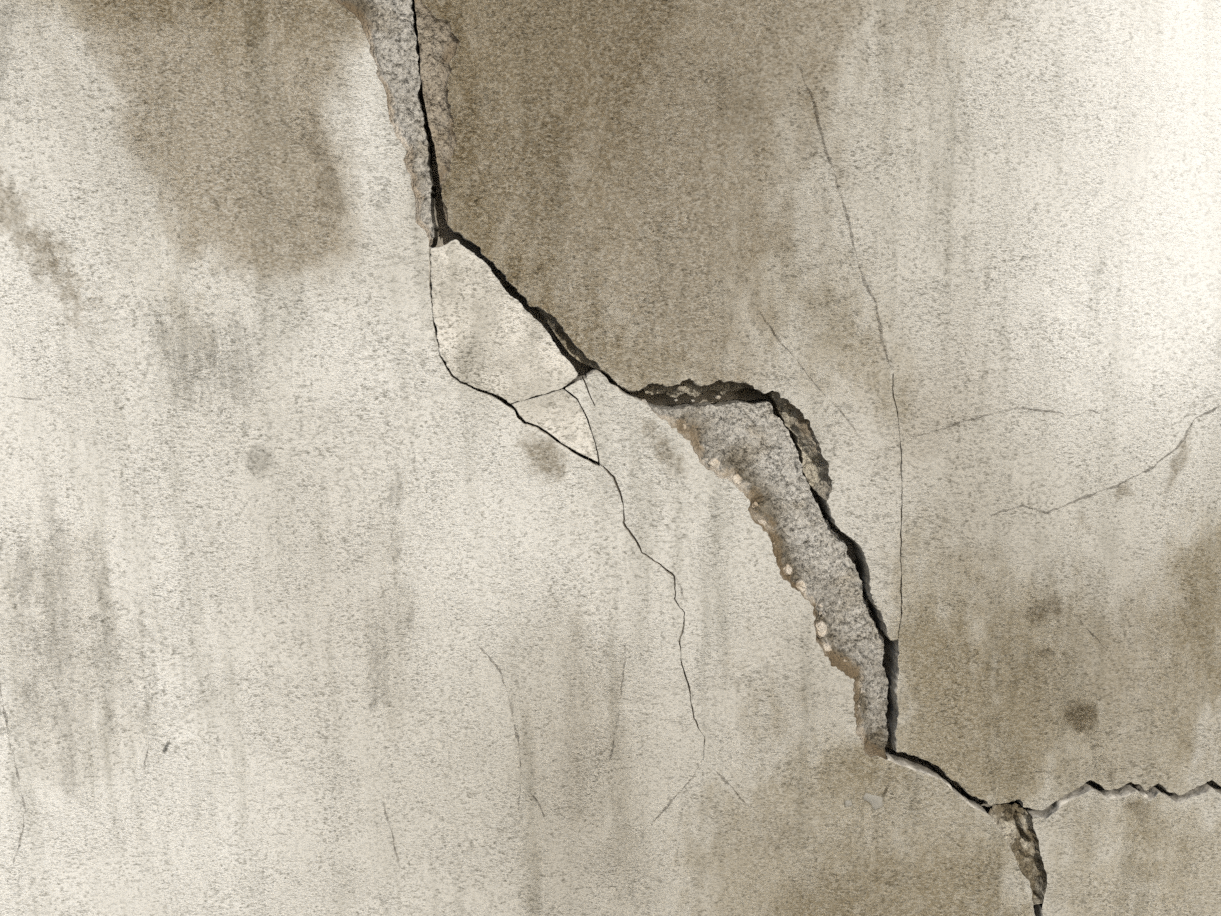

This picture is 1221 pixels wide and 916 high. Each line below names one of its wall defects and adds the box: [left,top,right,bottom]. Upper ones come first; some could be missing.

flaking render [334,0,460,247]
crack [422,97,796,752]
flaking render [647,391,890,760]
crack [810,373,1221,819]
crack [1033,904,1043,916]